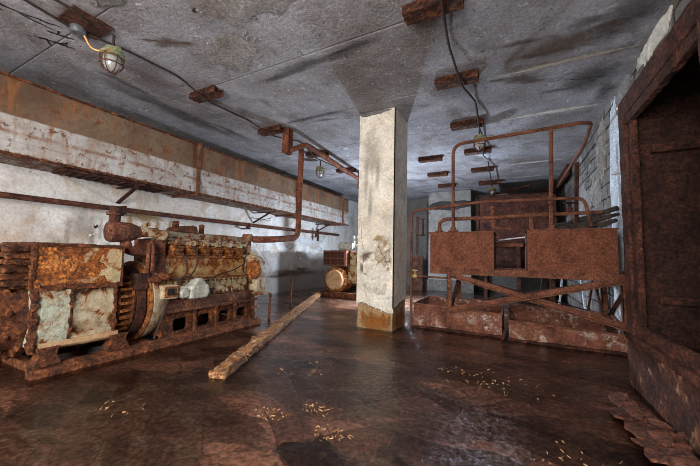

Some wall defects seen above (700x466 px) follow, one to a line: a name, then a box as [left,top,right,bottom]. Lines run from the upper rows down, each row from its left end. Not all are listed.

flaking render [579,5,673,273]